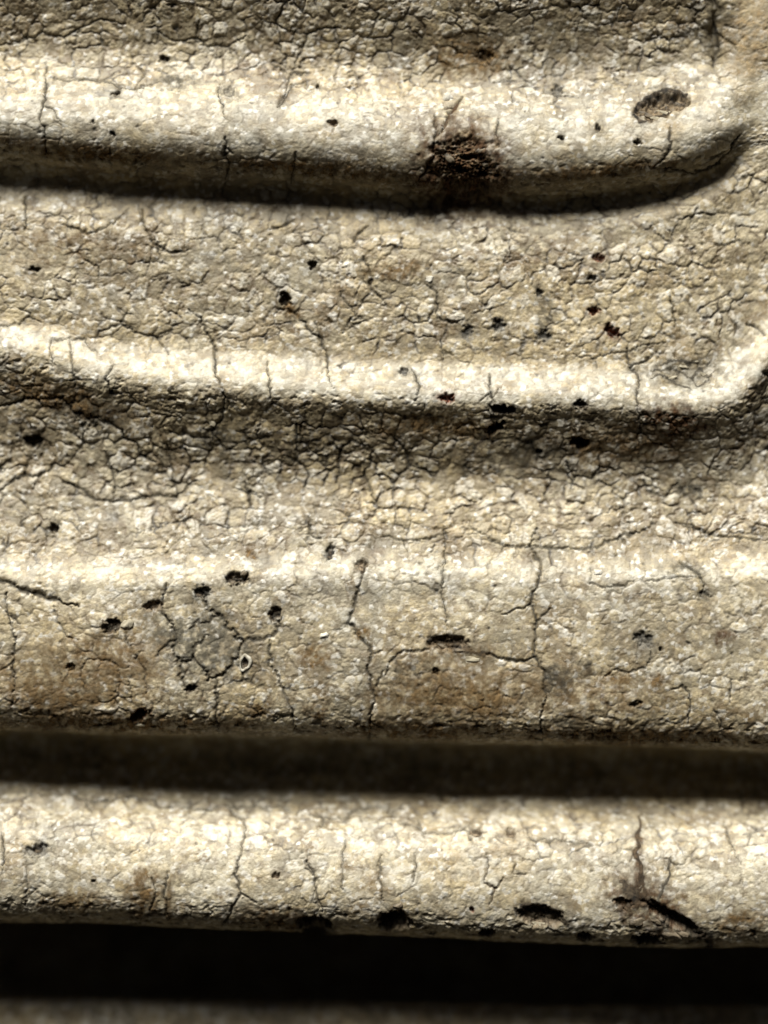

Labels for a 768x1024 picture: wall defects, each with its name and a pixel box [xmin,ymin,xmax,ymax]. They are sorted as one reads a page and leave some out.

crack [39,64,148,155]
crack [273,27,340,108]
crack [420,98,463,176]
rust [410,126,510,216]
spalling [632,88,690,123]
crack [0,311,197,503]
crack [284,424,432,502]
crack [577,297,675,448]
crack [0,580,79,703]
crack [81,584,296,731]
crack [348,565,426,739]
crack [470,518,764,732]